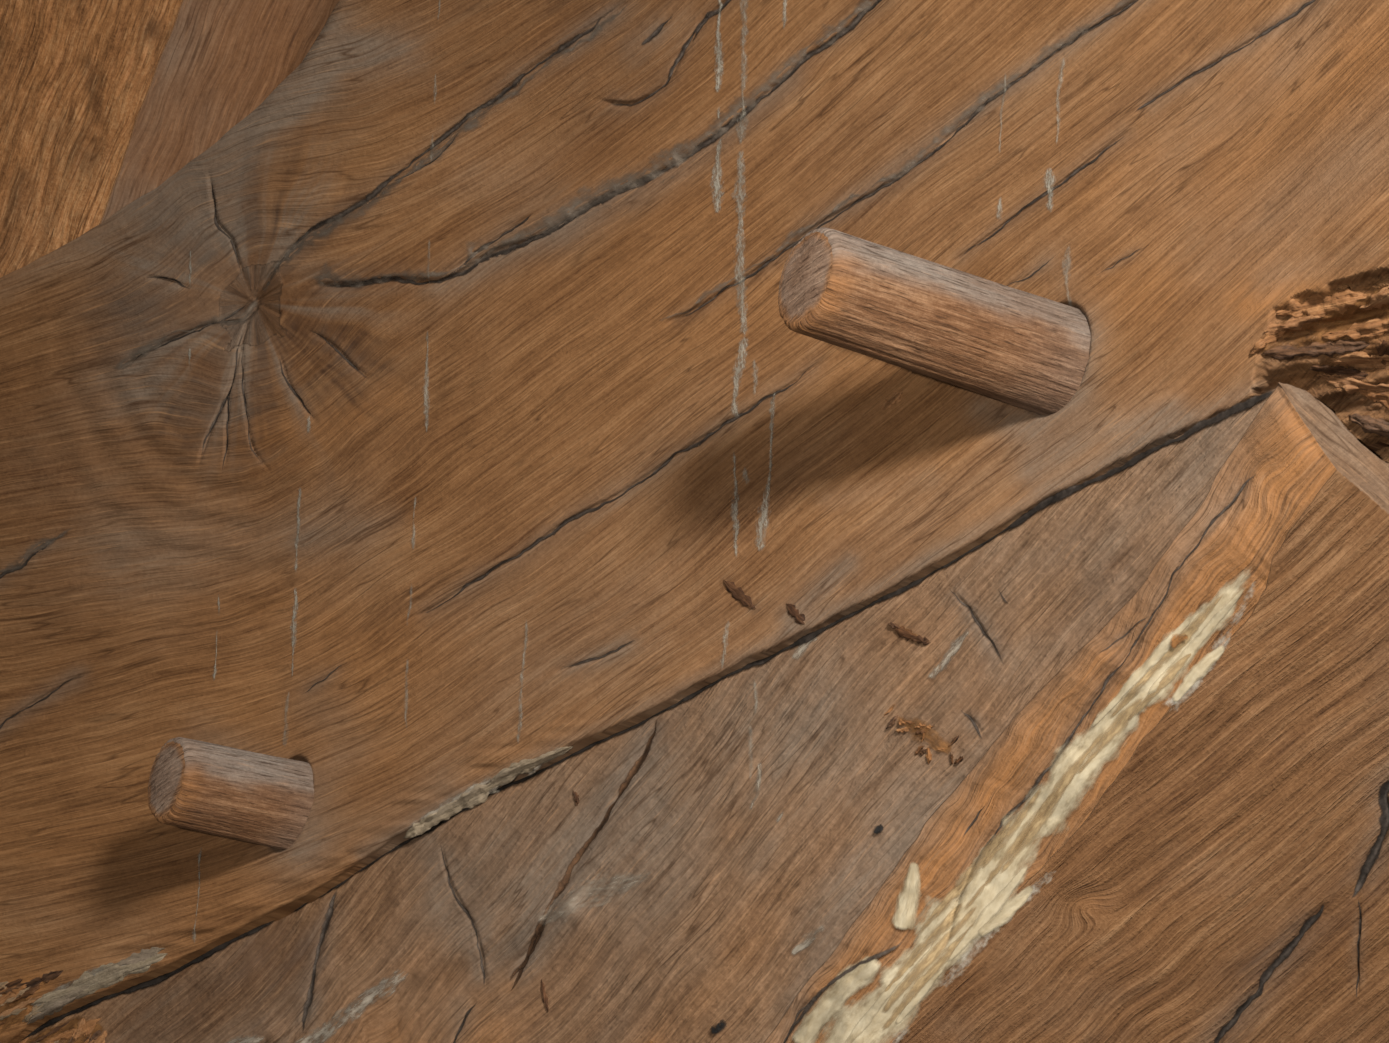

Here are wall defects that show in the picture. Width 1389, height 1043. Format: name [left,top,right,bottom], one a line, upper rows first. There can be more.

crack [119,0,881,465]
crack [427,371,806,613]
water stain [712,140,747,415]
water stain [759,402,774,549]
crack [667,0,1138,318]
crack [1137,0,1315,110]
peeling [1250,285,1389,439]
crack [302,894,336,1029]
crack [441,723,657,1043]
peeling [783,575,1244,1043]
crack [951,478,1251,899]
crack [1214,781,1389,1043]